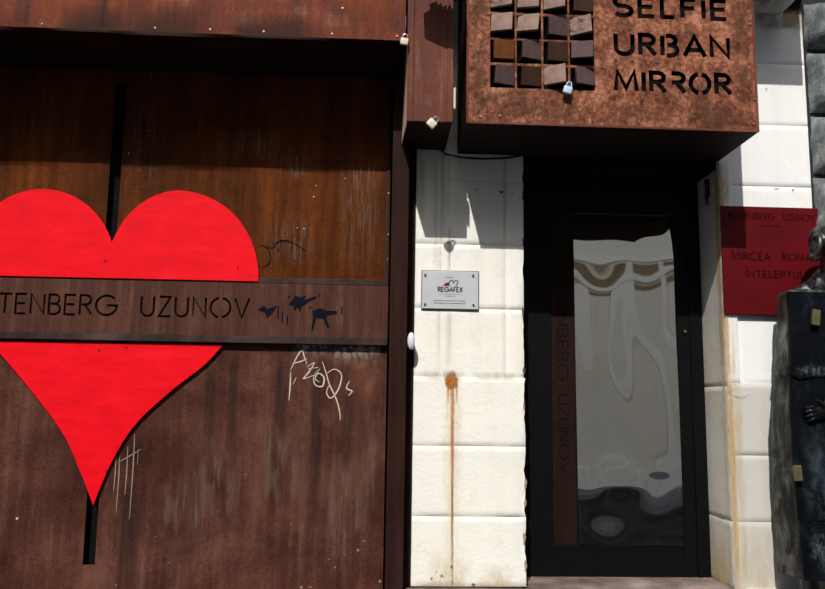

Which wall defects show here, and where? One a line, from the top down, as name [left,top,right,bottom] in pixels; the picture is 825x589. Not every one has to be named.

corrosion [445,371,457,506]